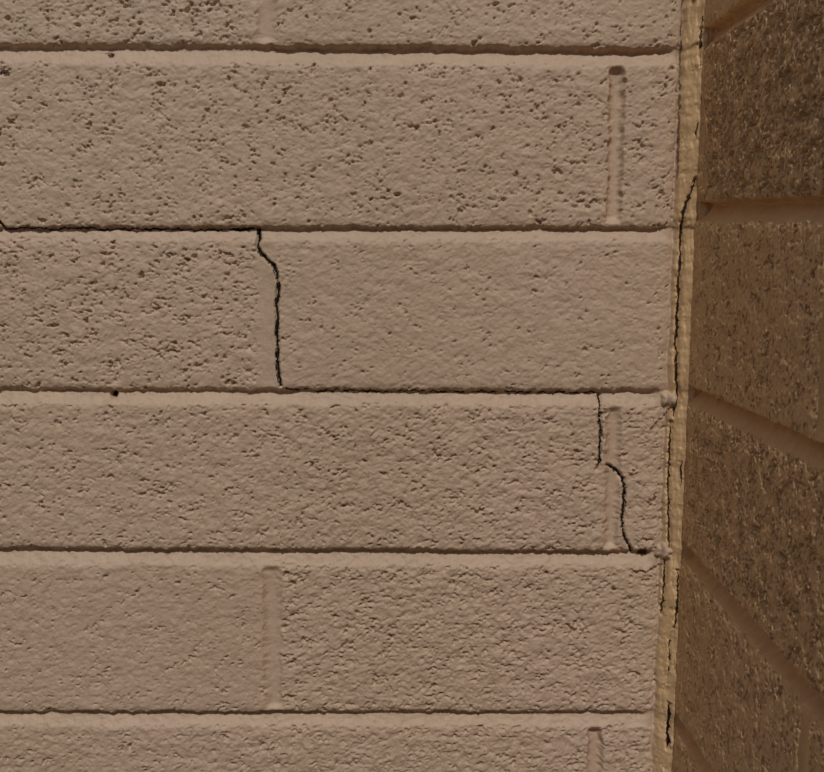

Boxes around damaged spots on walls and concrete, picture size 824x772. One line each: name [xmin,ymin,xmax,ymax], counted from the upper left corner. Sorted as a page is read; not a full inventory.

crack [0,221,631,551]
crack [660,0,703,678]
crack [664,703,672,746]